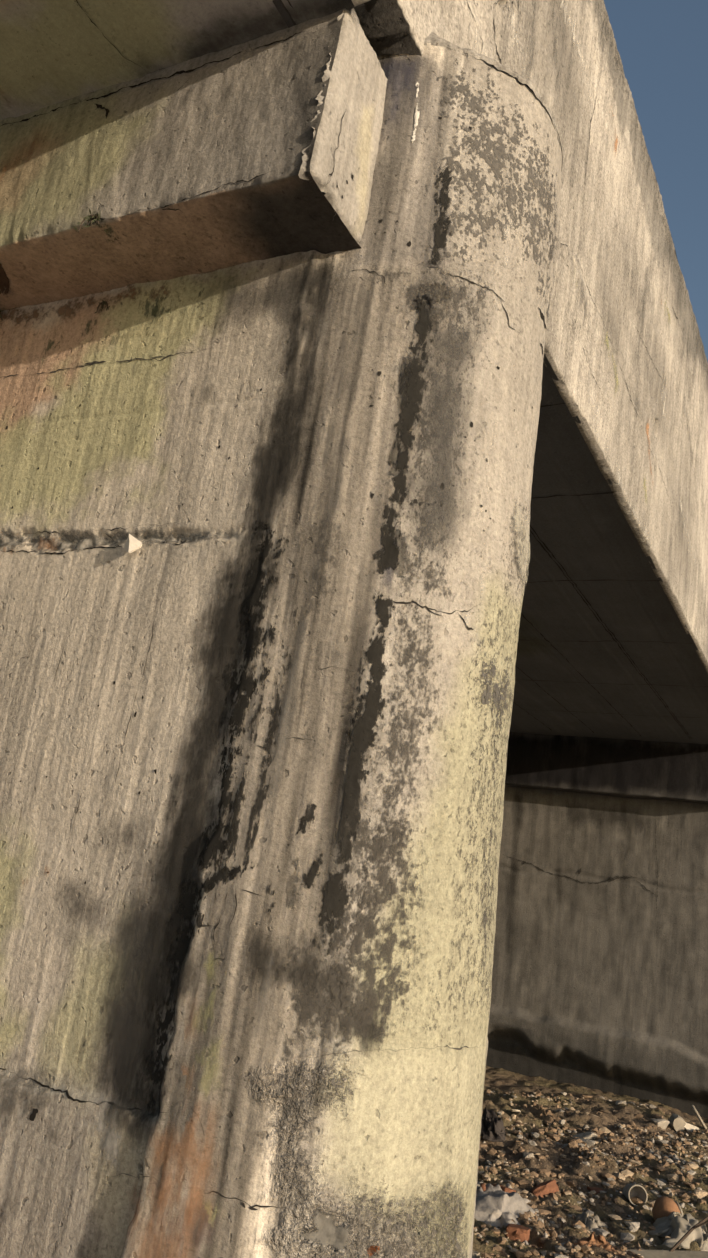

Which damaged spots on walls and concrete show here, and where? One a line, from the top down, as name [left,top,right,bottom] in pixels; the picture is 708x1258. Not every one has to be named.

crack [1,0,334,126]
crack [439,0,519,64]
water stain [304,149,313,180]
crack [2,349,206,469]
crack [3,522,226,555]
water stain [251,166,484,1060]
crack [393,601,476,632]
water stain [98,263,341,1165]
water stain [427,499,708,1041]
crack [505,821,659,920]
crack [0,1068,204,1133]
spalling [252,1045,469,1258]